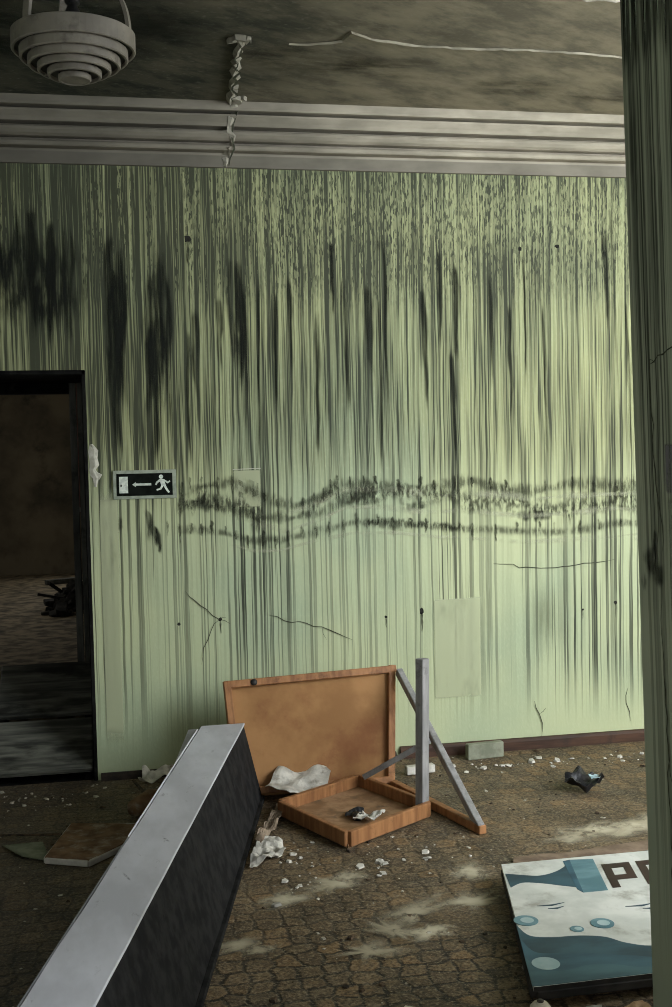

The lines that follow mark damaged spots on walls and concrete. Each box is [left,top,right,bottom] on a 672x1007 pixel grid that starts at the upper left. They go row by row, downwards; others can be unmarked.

crack [583,0,620,8]
water stain [16,213,75,334]
water stain [105,242,127,441]
water stain [147,258,172,450]
water stain [187,316,199,455]
water stain [217,264,261,437]
water stain [365,249,388,456]
water stain [438,254,459,452]
water stain [148,514,162,551]
water stain [179,476,637,548]
crack [186,592,230,660]
crack [270,615,352,640]